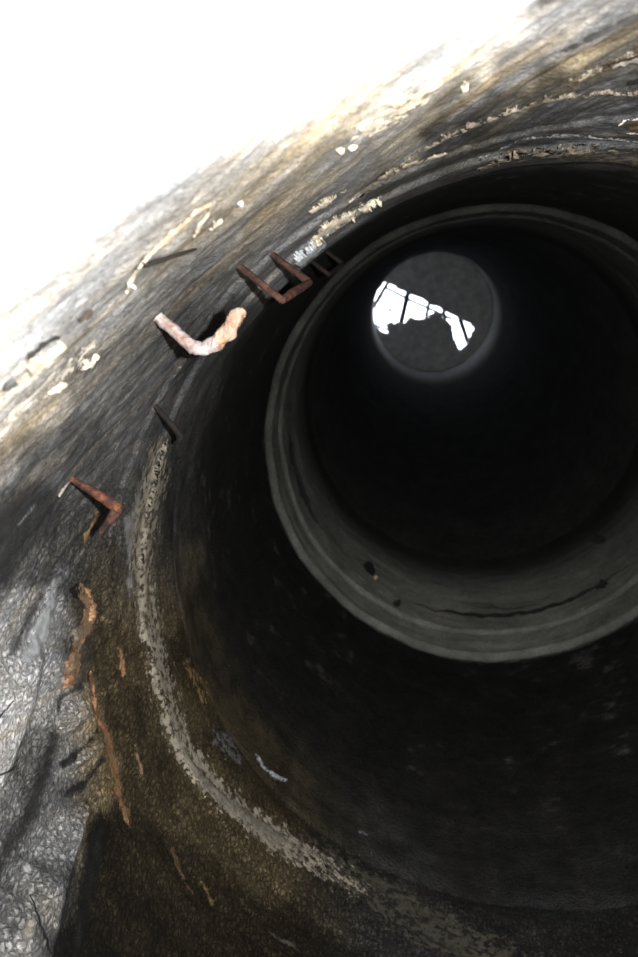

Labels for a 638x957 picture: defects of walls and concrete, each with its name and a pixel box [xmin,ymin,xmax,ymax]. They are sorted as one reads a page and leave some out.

flaking render [560,47,638,89]
peeling [335,72,443,156]
leakage [478,141,638,178]
leakage [309,189,347,214]
leakage [294,196,382,268]
flaking render [0,332,105,440]
flaking render [255,754,288,782]